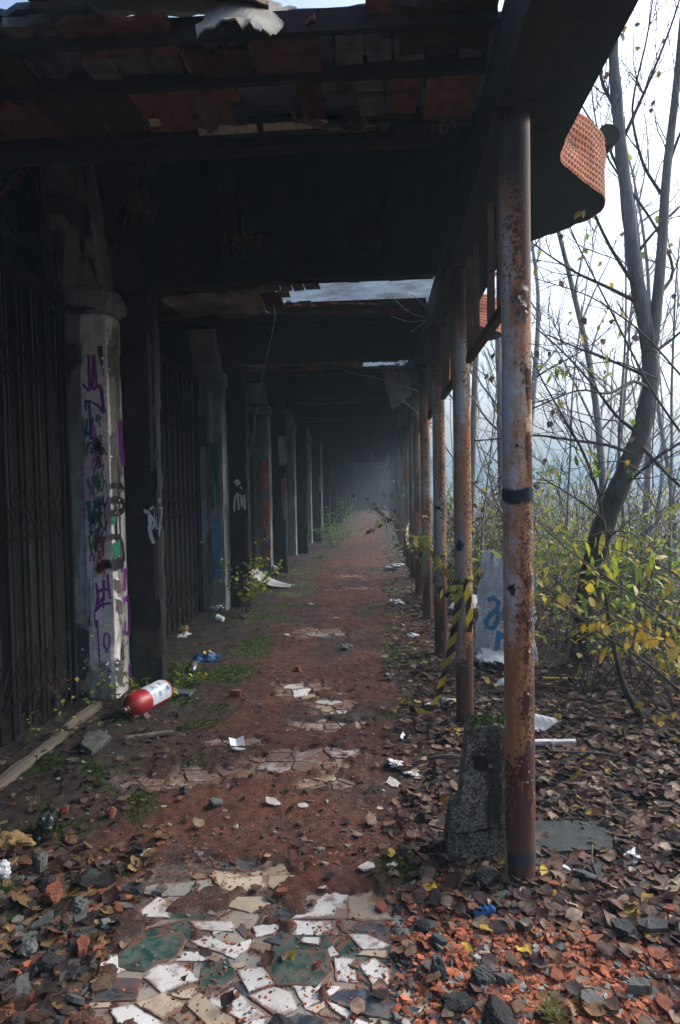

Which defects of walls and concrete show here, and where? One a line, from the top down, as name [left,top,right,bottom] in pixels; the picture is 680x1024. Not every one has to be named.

rust [526,366,534,415]
rust [526,429,534,492]
peeling [357,861,398,872]